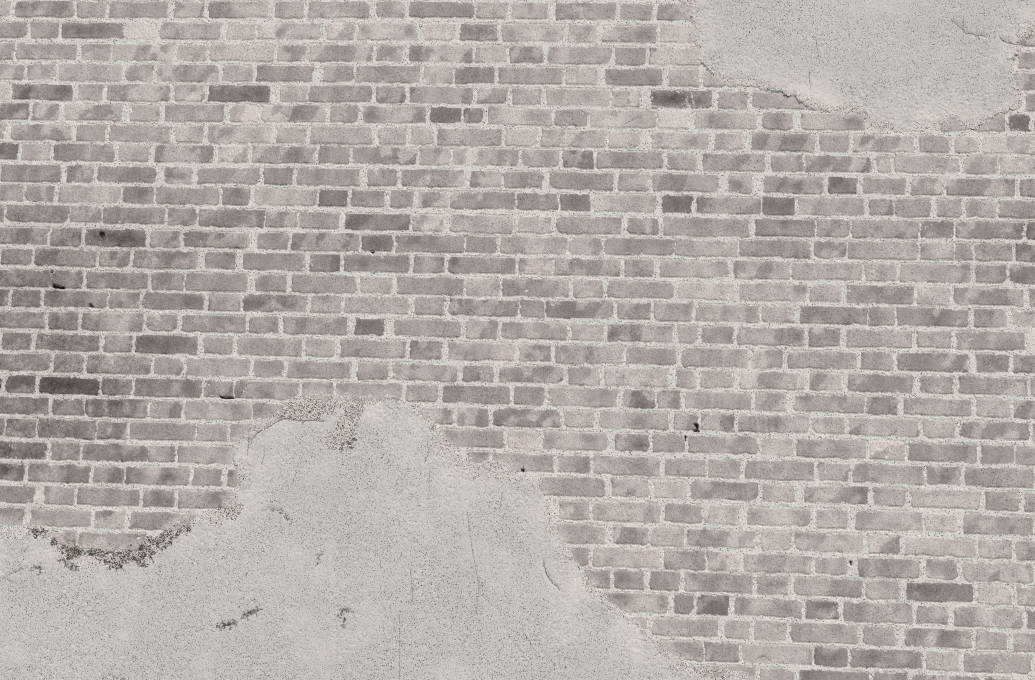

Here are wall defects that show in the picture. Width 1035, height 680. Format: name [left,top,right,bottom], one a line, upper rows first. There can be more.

flaking render [679,0,1035,134]
spalling [0,392,758,680]